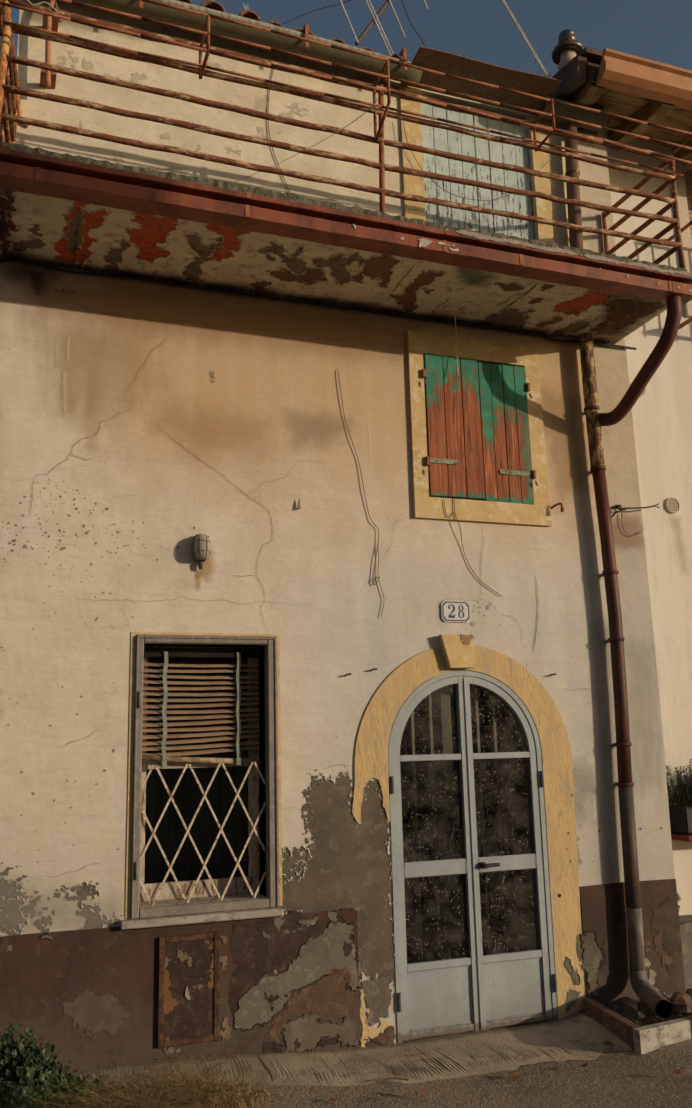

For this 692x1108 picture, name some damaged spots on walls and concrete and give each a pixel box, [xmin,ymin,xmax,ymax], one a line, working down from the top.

peeling [0,189,253,282]
spalling [247,242,445,312]
peeling [418,228,692,292]
peeling [475,281,666,335]
crack [30,296,323,631]
peeling [0,862,123,951]
peeling [217,769,400,1054]
peeling [56,990,130,1041]
peeling [164,936,228,1014]
spalling [563,930,604,1011]